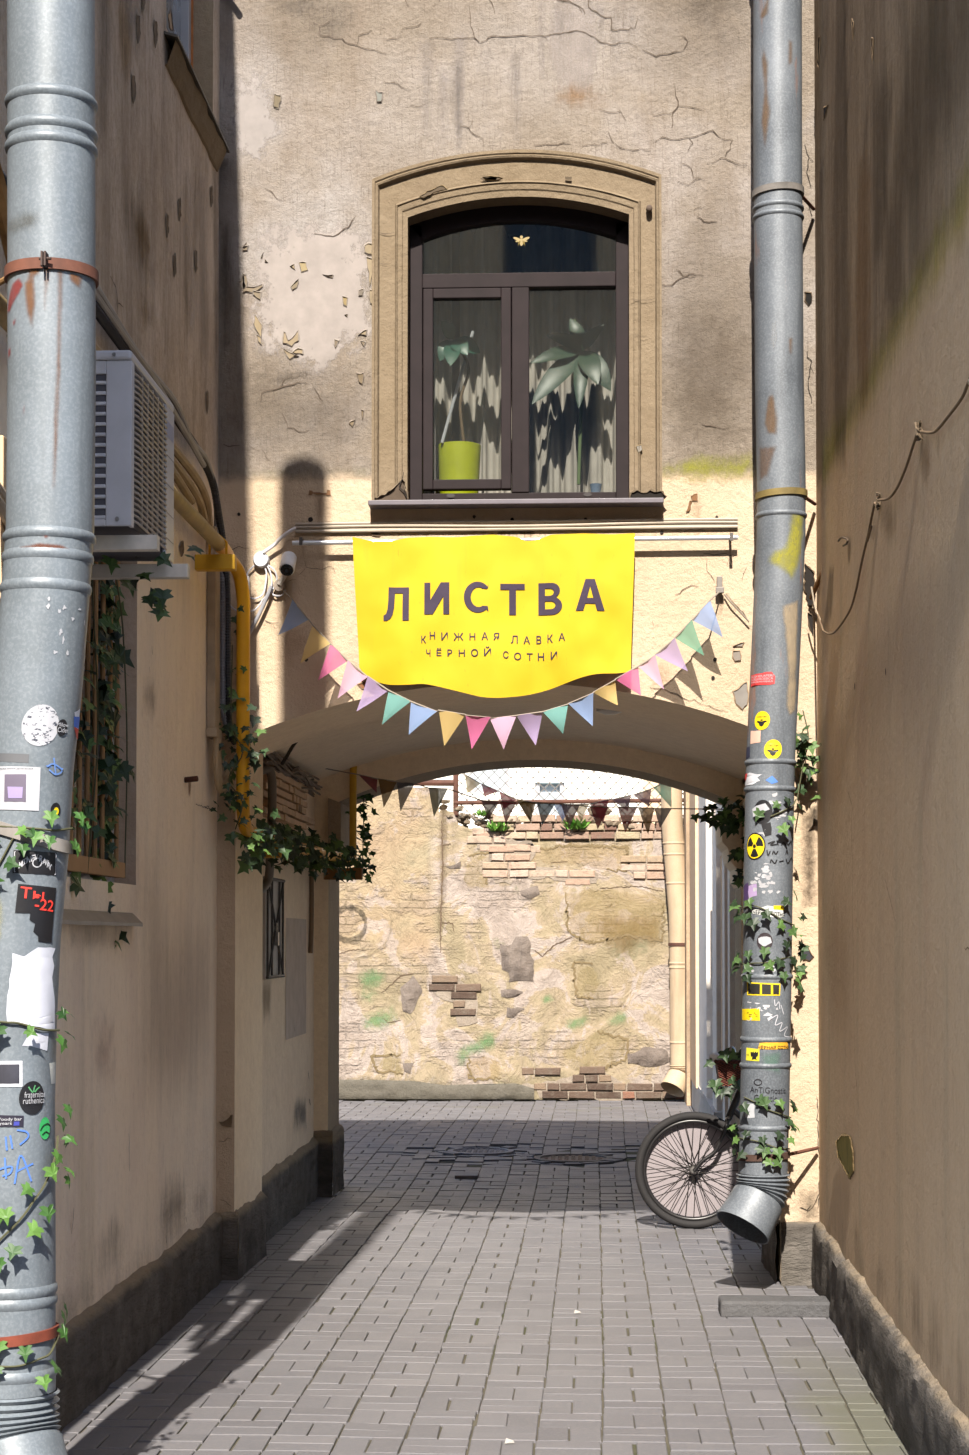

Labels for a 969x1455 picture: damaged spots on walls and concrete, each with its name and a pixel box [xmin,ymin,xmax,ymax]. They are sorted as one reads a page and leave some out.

crack [315,0,688,106]
crack [542,90,746,223]
rust [27,269,36,315]
peeling [237,273,264,345]
peeling [282,330,304,360]
peeling [290,261,334,291]
peeling [342,242,372,317]
crack [632,269,700,301]
flaking render [400,971,481,1026]
flaking render [500,936,534,1018]